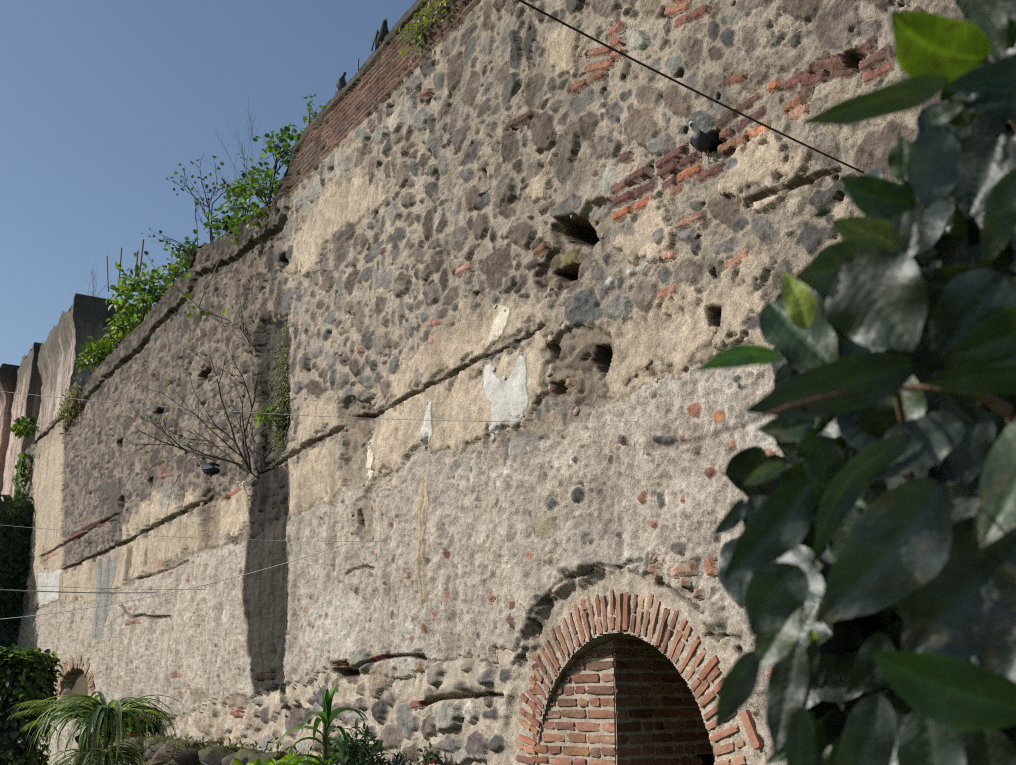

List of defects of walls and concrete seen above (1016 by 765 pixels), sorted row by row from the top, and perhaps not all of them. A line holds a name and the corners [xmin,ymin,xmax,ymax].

crack [376,324,547,418]
peeling [481,352,528,439]
crack [262,428,348,474]
crack [42,503,207,571]
crack [331,652,427,667]